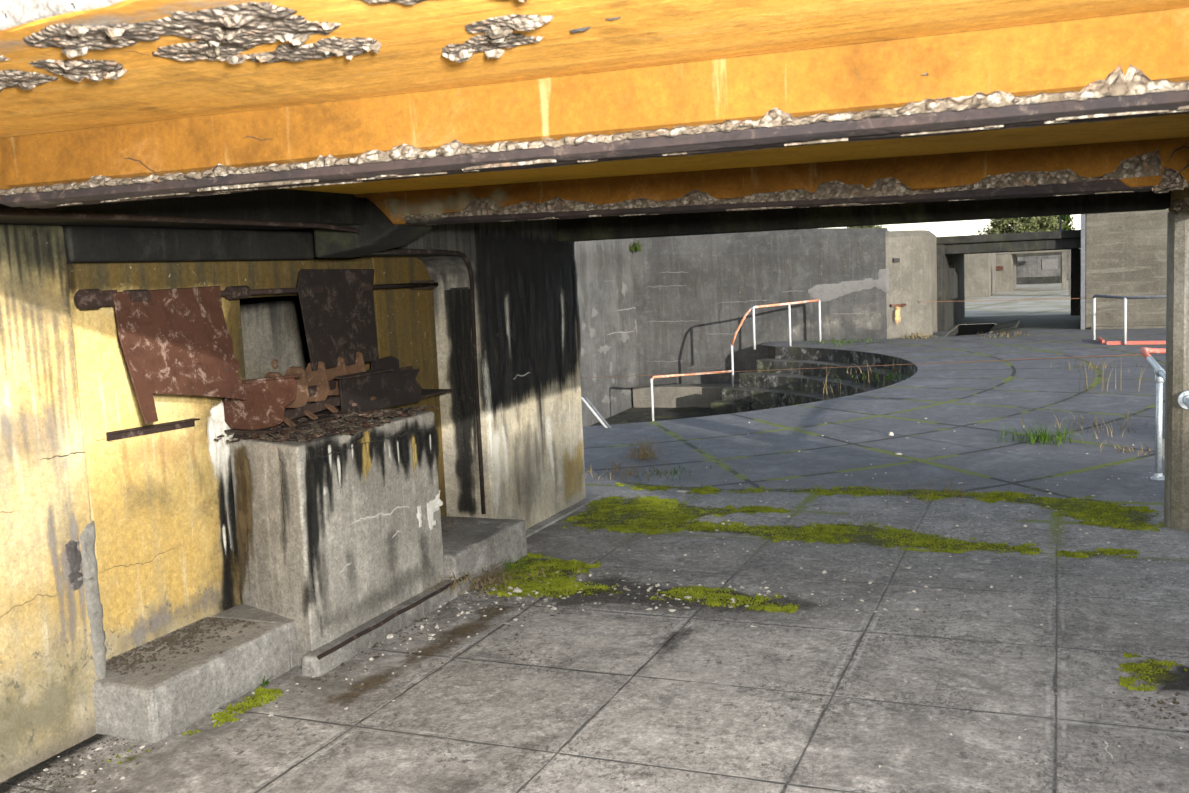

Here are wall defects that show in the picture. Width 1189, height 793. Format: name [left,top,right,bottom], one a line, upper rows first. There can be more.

spalling [0,2,381,92]
spalling [0,64,1189,208]
spalling [402,149,1189,226]
water stain [445,230,581,515]
crack [0,587,66,618]
water stain [49,512,85,638]
crack [99,548,174,573]
water stain [203,402,253,611]
water stain [304,421,439,612]